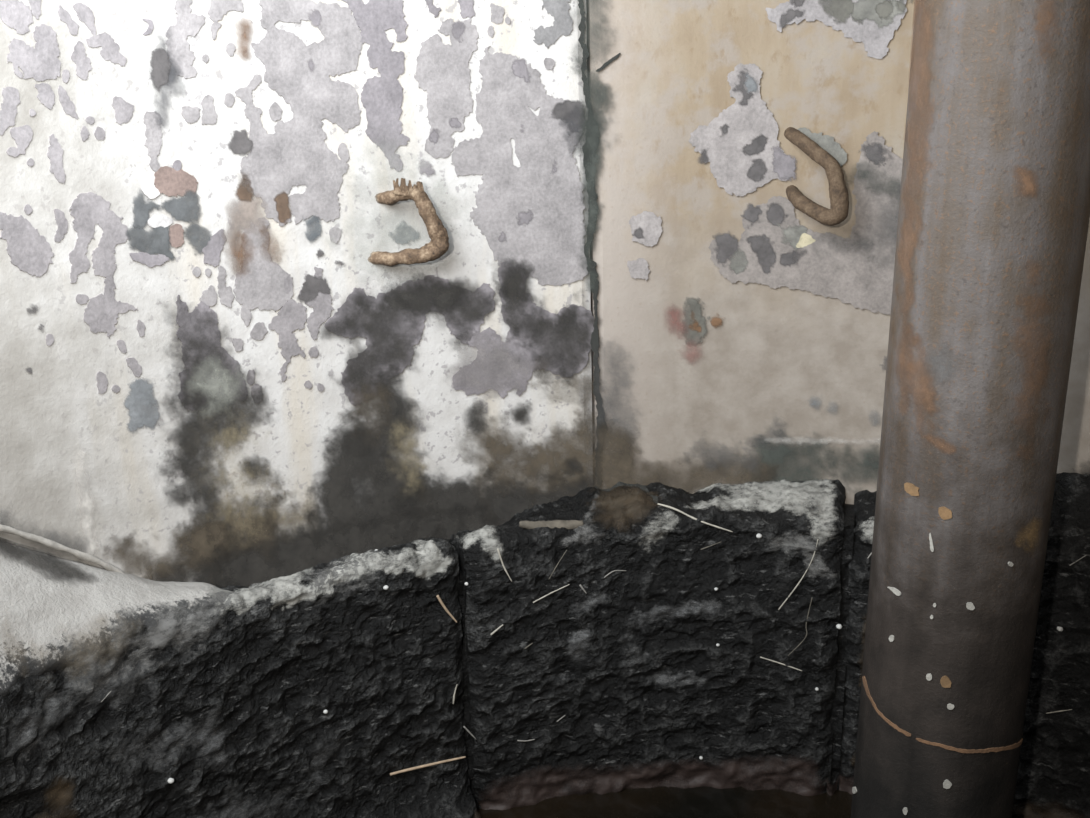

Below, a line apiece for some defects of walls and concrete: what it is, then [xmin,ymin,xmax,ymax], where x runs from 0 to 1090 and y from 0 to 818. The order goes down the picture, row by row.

crack [578,0,621,167]
peeling [766,0,912,59]
peeling [0,0,588,381]
leakage [553,74,606,290]
peeling [689,63,903,315]
leakage [0,537,89,579]
leakage [48,467,96,555]
peeling [96,371,120,394]
peeling [246,370,262,396]
leakage [114,261,879,615]
crack [584,233,608,489]